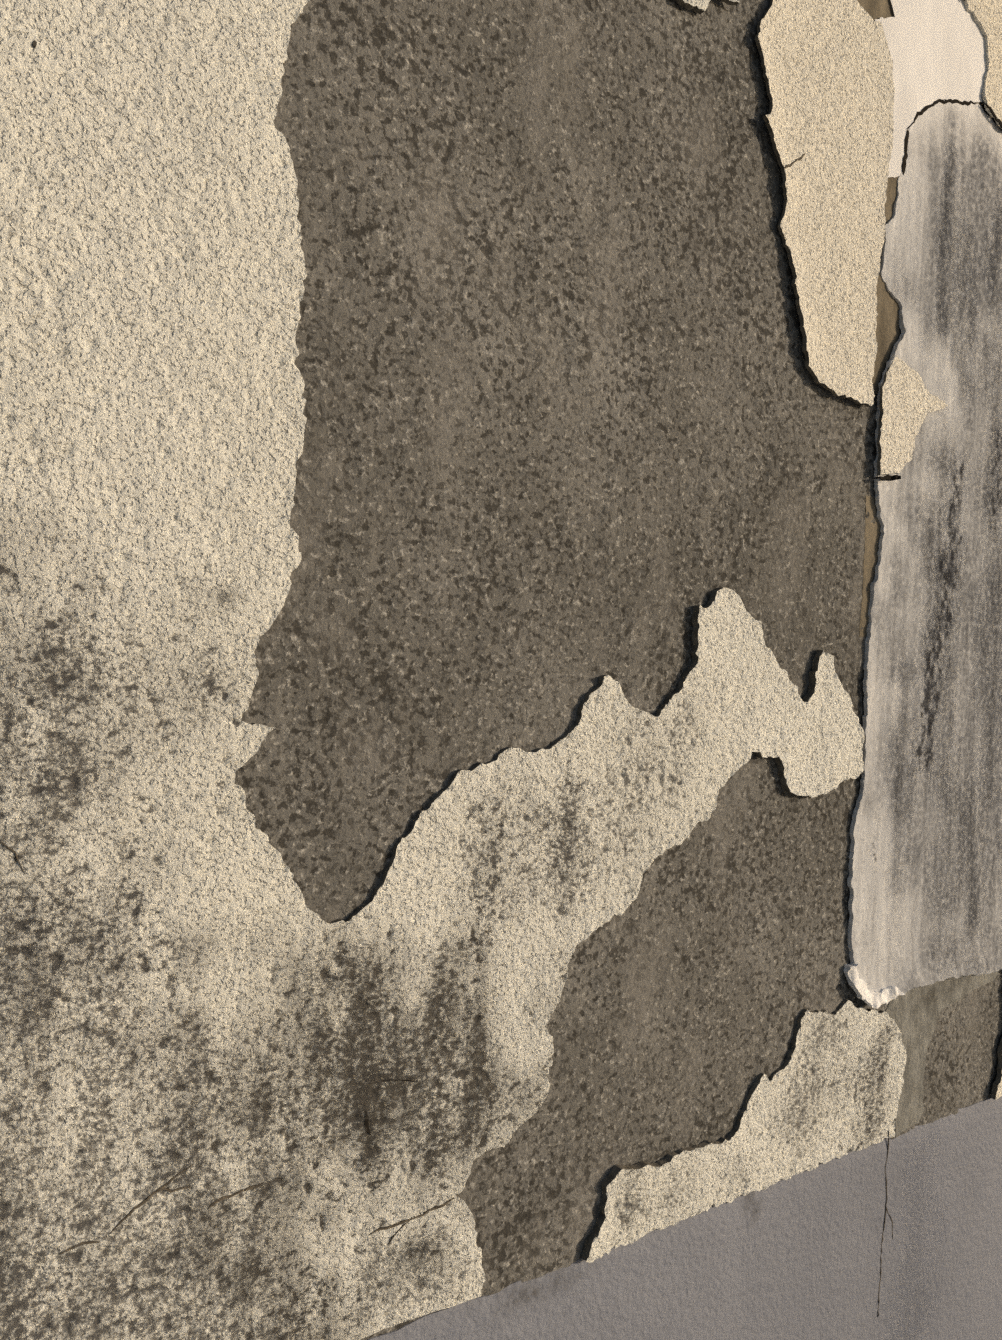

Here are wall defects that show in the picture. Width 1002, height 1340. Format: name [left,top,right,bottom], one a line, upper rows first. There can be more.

leakage [930,142,1002,336]
leakage [0,552,20,594]
spalling [234,0,1002,1298]
leakage [896,408,1002,967]
leakage [0,583,698,1340]
leakage [758,1010,896,1167]
crack [877,1131,893,1317]